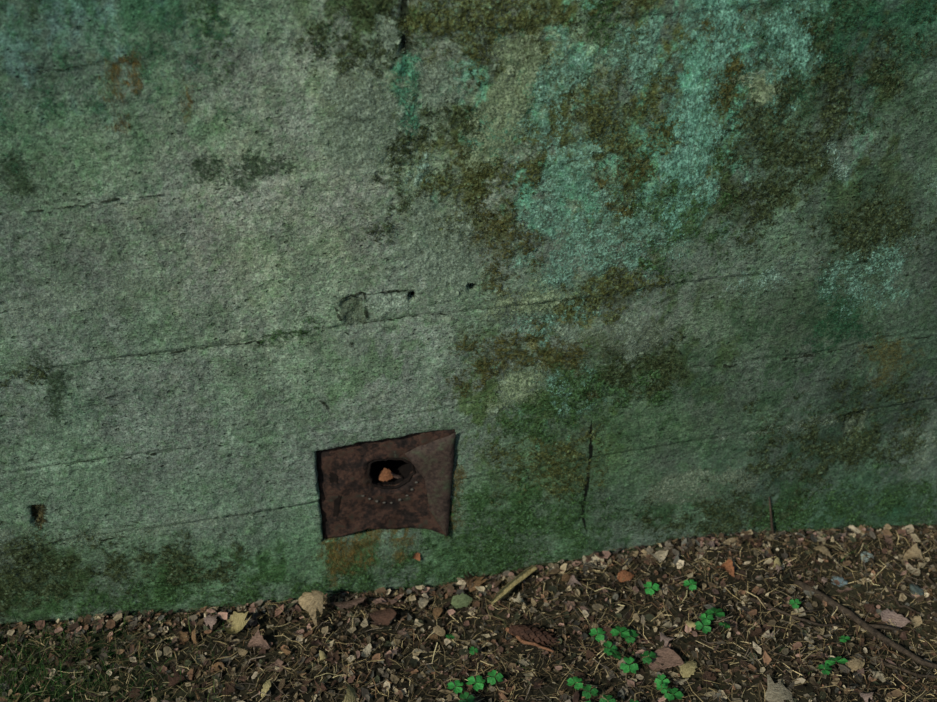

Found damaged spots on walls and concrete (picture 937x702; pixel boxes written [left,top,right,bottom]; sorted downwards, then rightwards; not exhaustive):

crack [401,0,410,70]
water stain [329,288,412,361]
crack [579,421,592,533]
spalling [30,504,47,531]